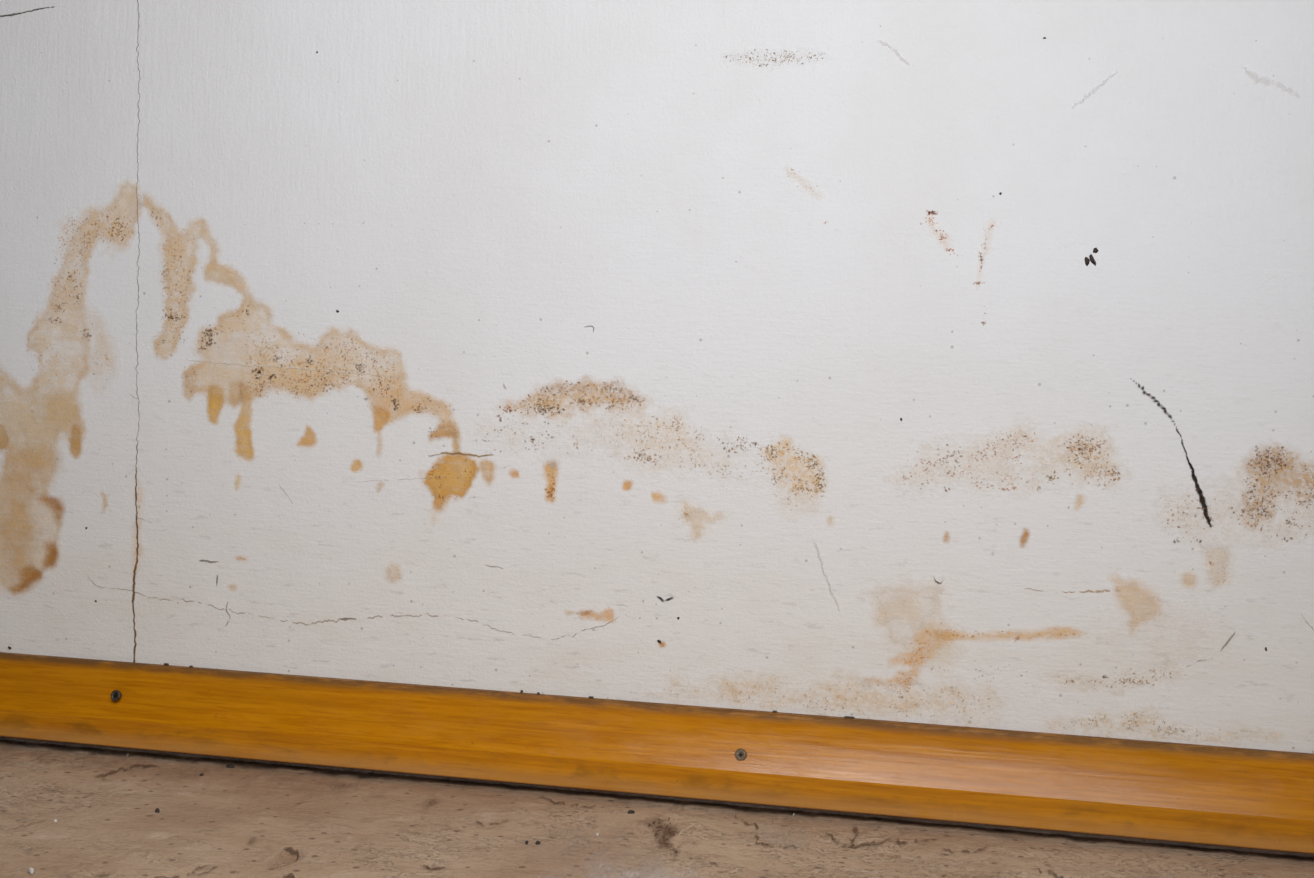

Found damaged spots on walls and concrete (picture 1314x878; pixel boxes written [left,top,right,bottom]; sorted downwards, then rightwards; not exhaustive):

crack [88,0,240,663]
damp [0,193,501,591]
crack [430,450,492,458]
damp [498,381,824,506]
damp [1231,446,1314,539]